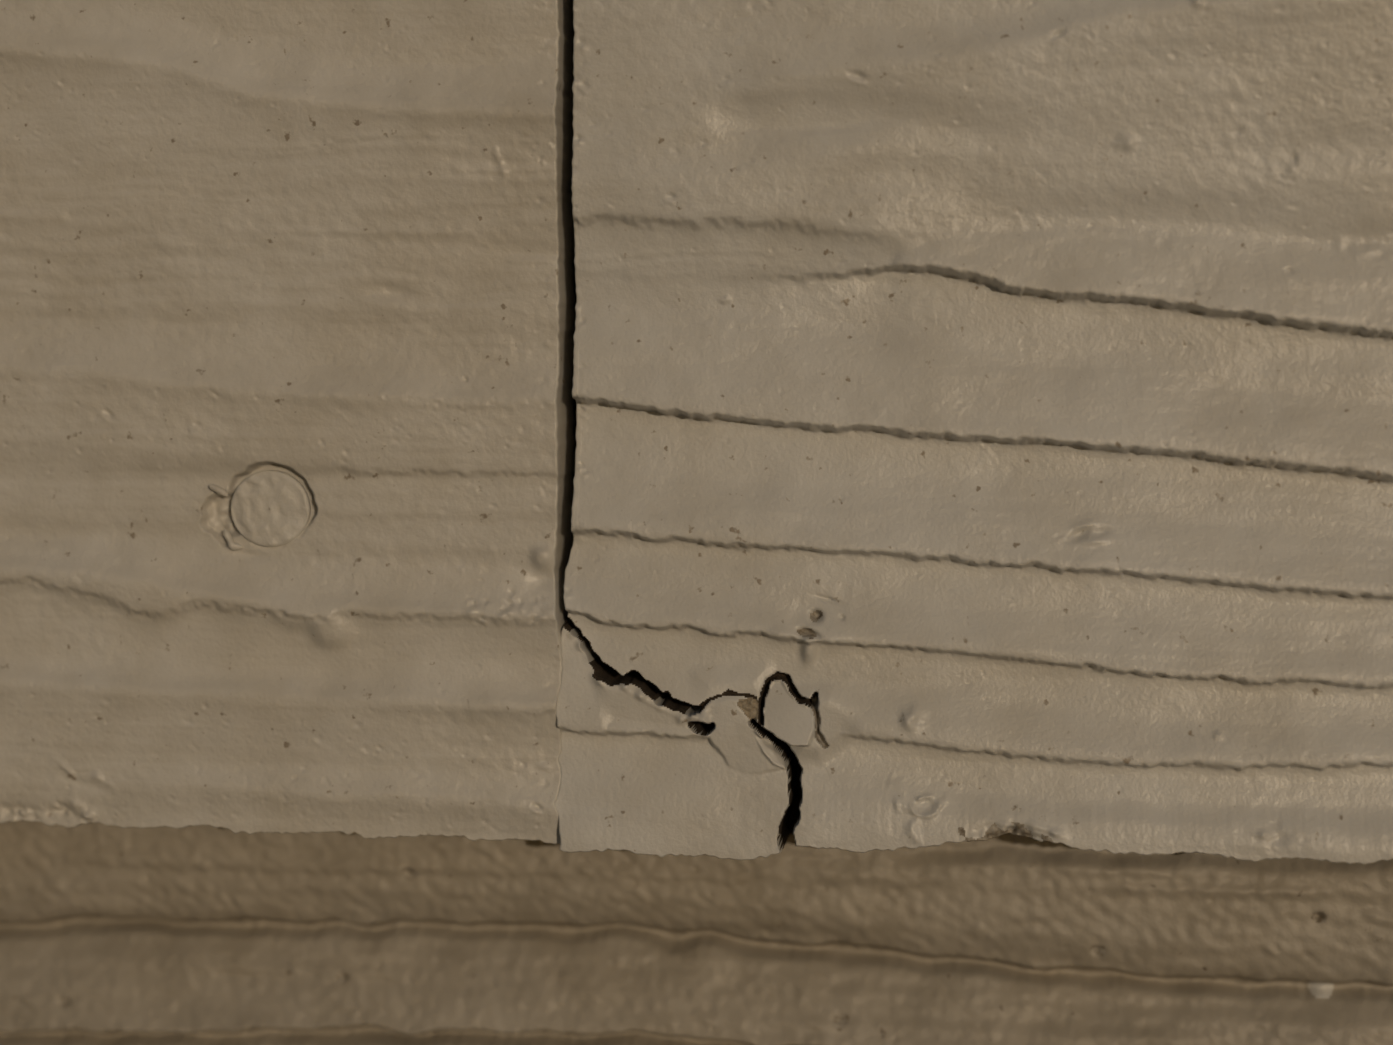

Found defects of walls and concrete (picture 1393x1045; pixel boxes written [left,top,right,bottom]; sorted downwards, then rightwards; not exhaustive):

crack [564,616,802,850]